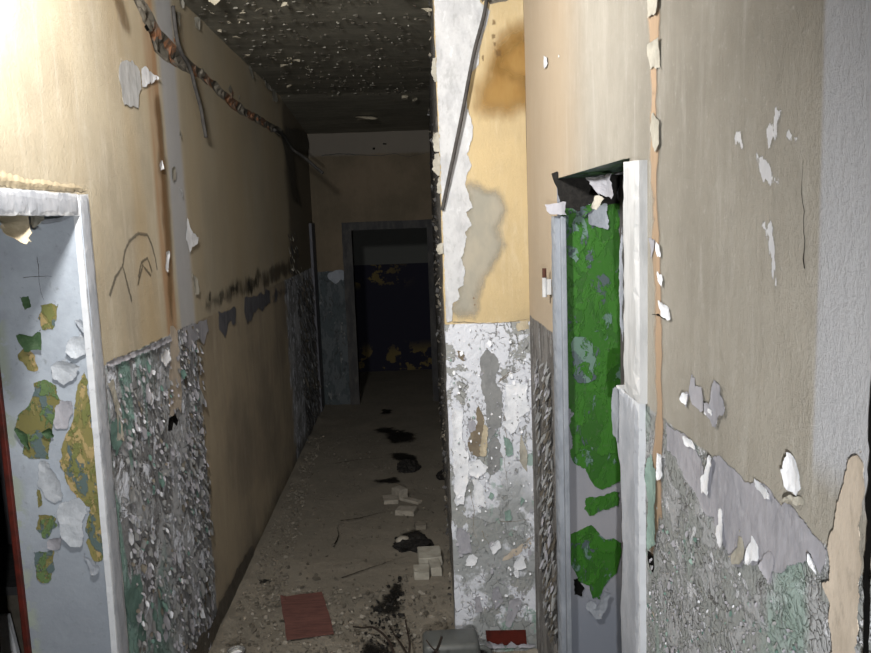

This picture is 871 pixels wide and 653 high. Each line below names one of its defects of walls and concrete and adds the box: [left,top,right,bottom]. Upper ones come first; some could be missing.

peeling [647,0,658,18]
damp [481,28,526,112]
peeling [647,37,661,69]
peeling [650,113,660,152]
peeling [194,0,508,342]
peeling [649,238,661,259]
peeling [652,300,671,321]
peeling [679,374,725,428]
peeling [438,321,558,649]